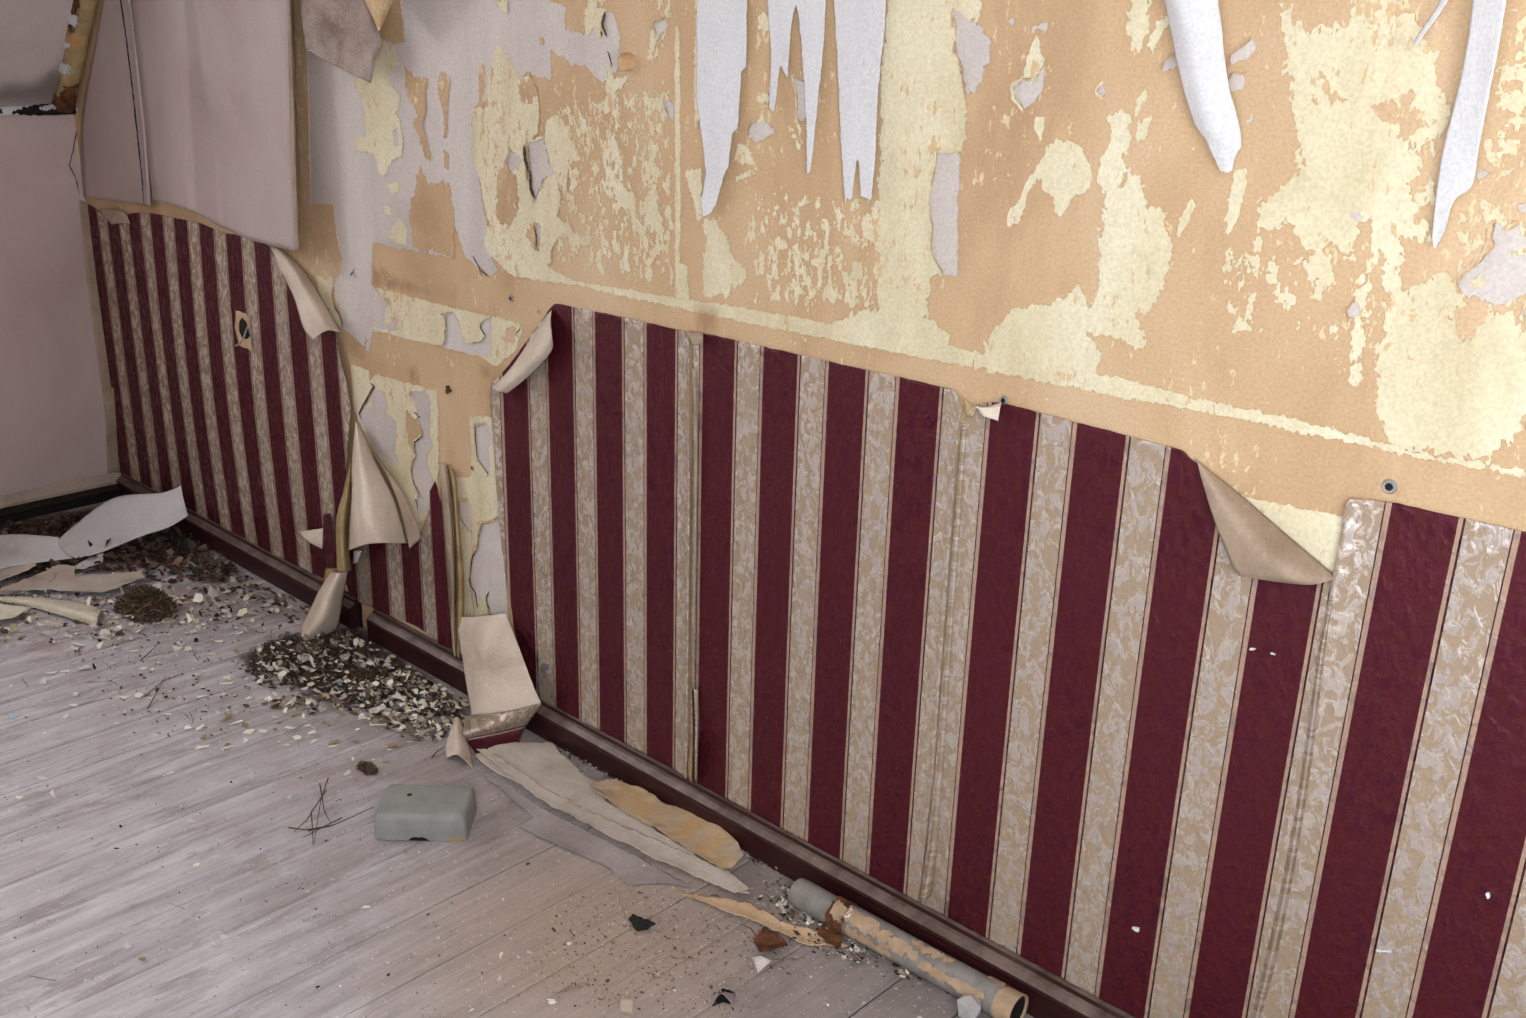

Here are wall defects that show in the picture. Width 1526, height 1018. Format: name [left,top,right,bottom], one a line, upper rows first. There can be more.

peeling [58,13,78,75]
flaking render [271,0,1526,659]